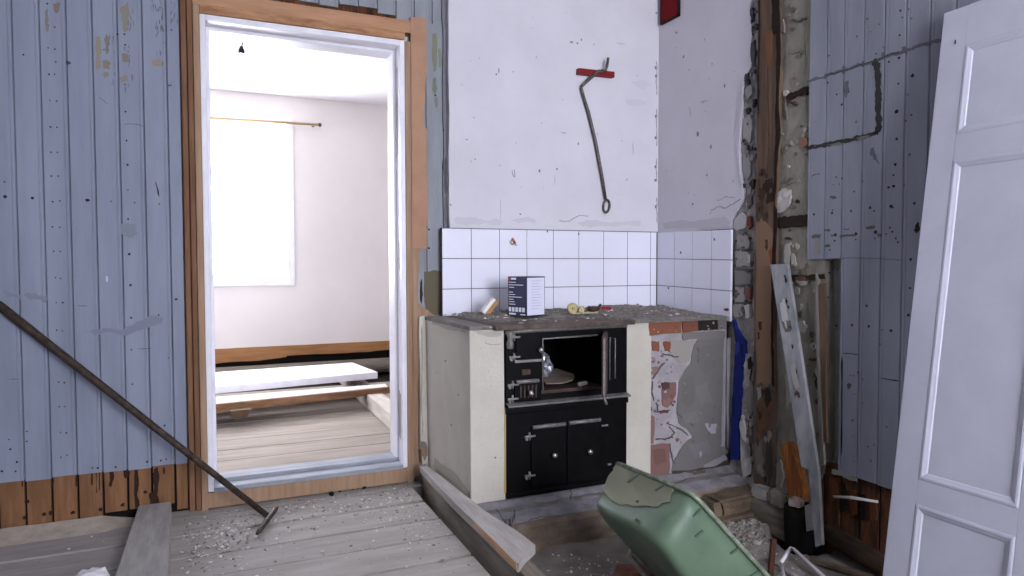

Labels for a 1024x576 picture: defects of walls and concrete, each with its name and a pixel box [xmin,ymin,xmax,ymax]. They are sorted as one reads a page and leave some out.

peeling [95,34,129,83]
peeling [777,188,792,213]
spalling [648,0,759,486]
peeling [784,243,796,266]